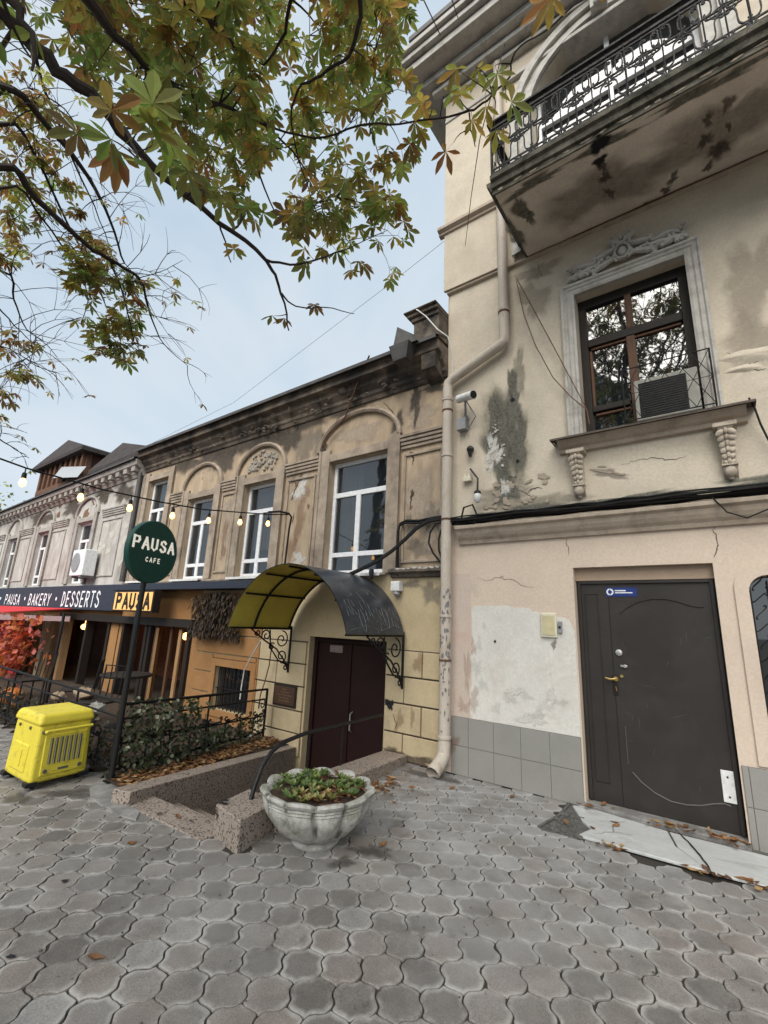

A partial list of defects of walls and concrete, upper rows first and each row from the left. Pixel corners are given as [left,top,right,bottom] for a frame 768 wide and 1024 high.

damp [655,52,768,115]
damp [667,89,768,171]
damp [506,128,638,245]
flaking render [483,473,550,509]
crack [680,834,713,875]